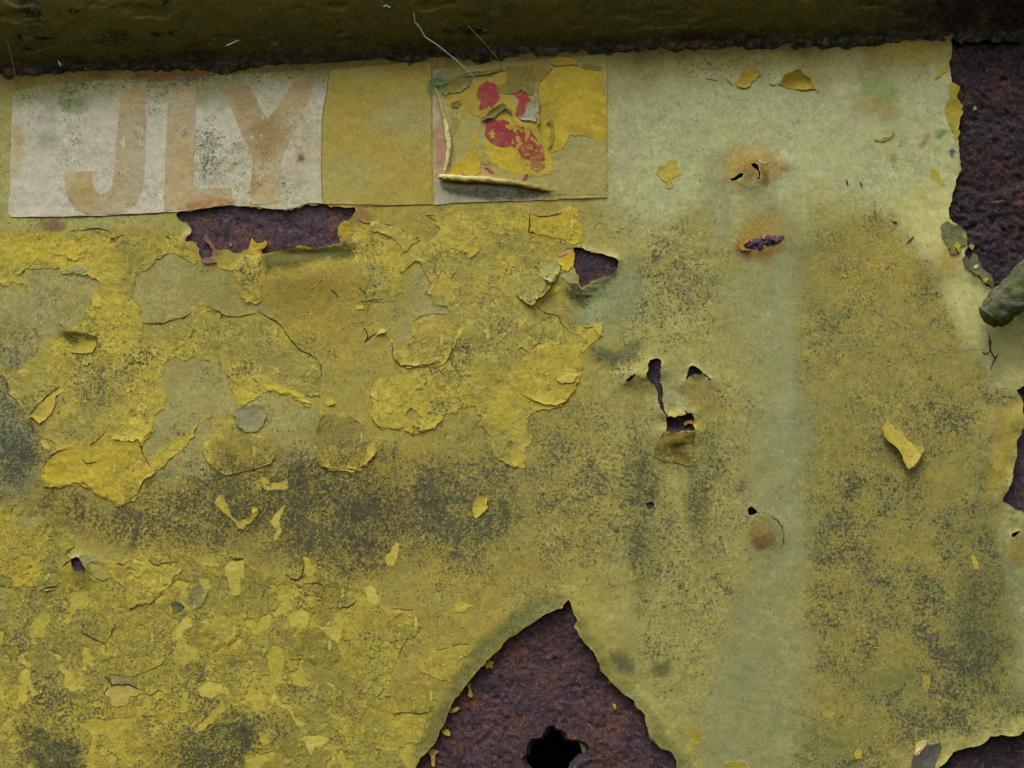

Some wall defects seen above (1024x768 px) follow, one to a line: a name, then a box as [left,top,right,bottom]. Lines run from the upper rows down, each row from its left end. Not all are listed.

corrosion [0,65,95,79]
corrosion [120,60,281,80]
corrosion [380,29,1024,288]
corrosion [177,202,356,264]
crack [144,306,322,374]
peeling [0,205,604,507]
peeling [654,406,707,466]
peeling [215,494,259,530]
peeling [472,497,488,518]
peeling [0,503,473,768]
corrosion [416,600,677,768]